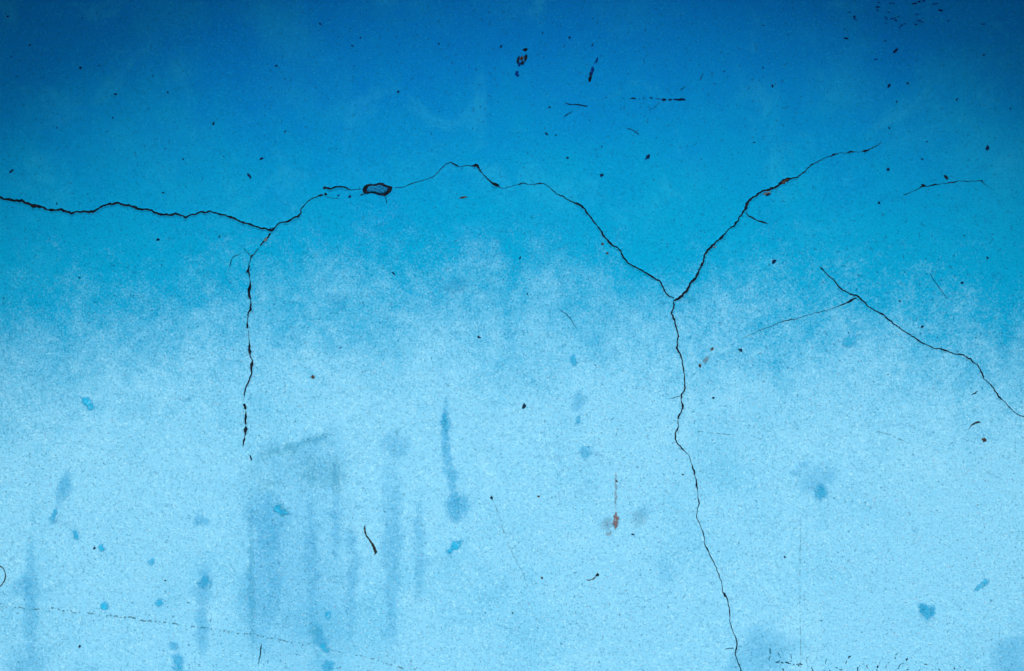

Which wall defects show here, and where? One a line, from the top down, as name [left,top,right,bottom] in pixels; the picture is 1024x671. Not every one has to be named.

crack [904,175,990,195]
crack [0,184,361,446]
crack [396,142,966,671]
crack [744,267,1024,417]
crack [2,606,310,664]